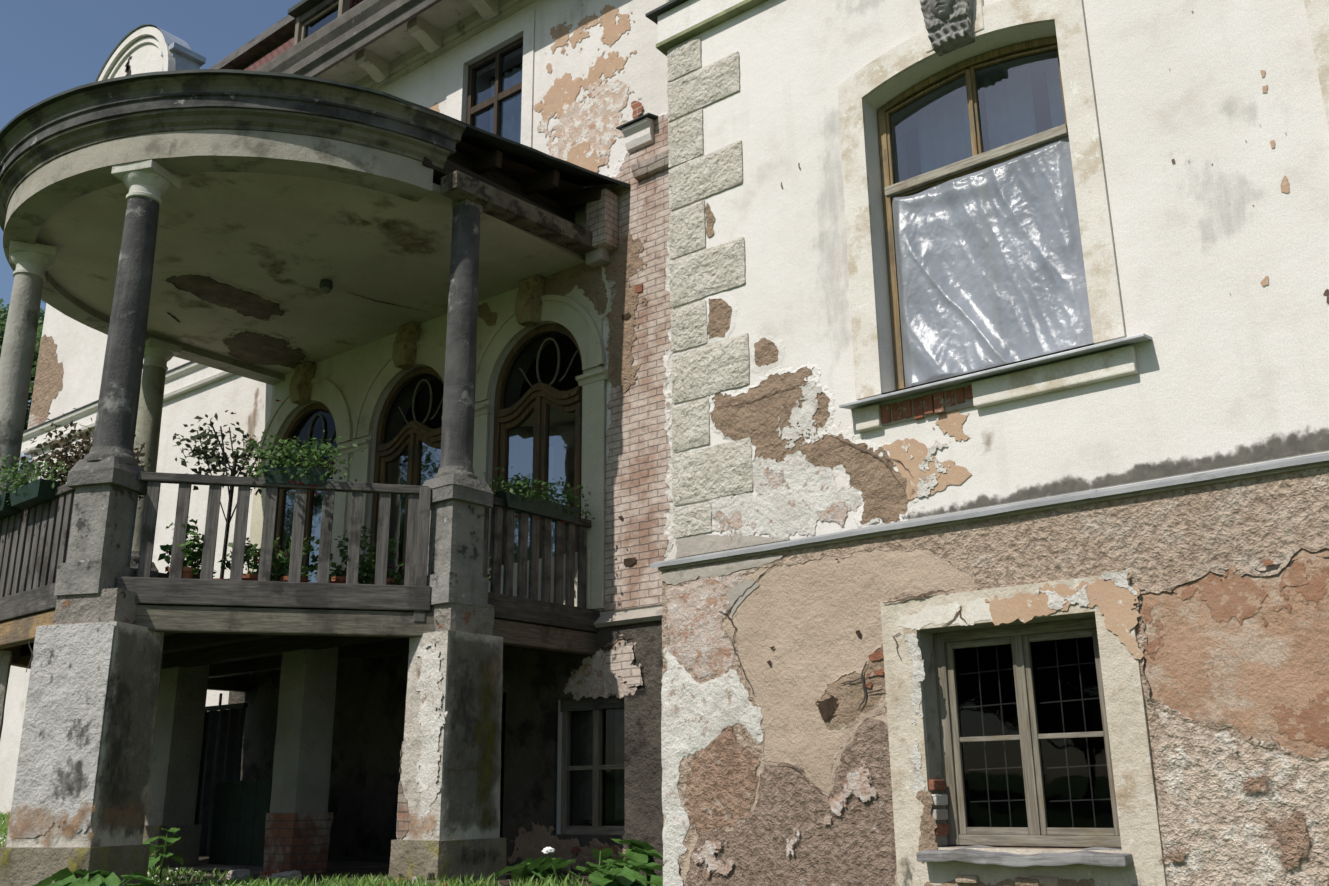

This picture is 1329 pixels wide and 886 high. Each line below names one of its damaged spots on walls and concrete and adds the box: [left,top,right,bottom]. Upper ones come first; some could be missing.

peeling [27,334,64,429]
spalling [534,4,1329,886]
damp [903,428,1329,519]
crack [720,565,773,694]
damp [54,760,82,799]
damp [63,631,163,839]
spalling [507,821,628,873]